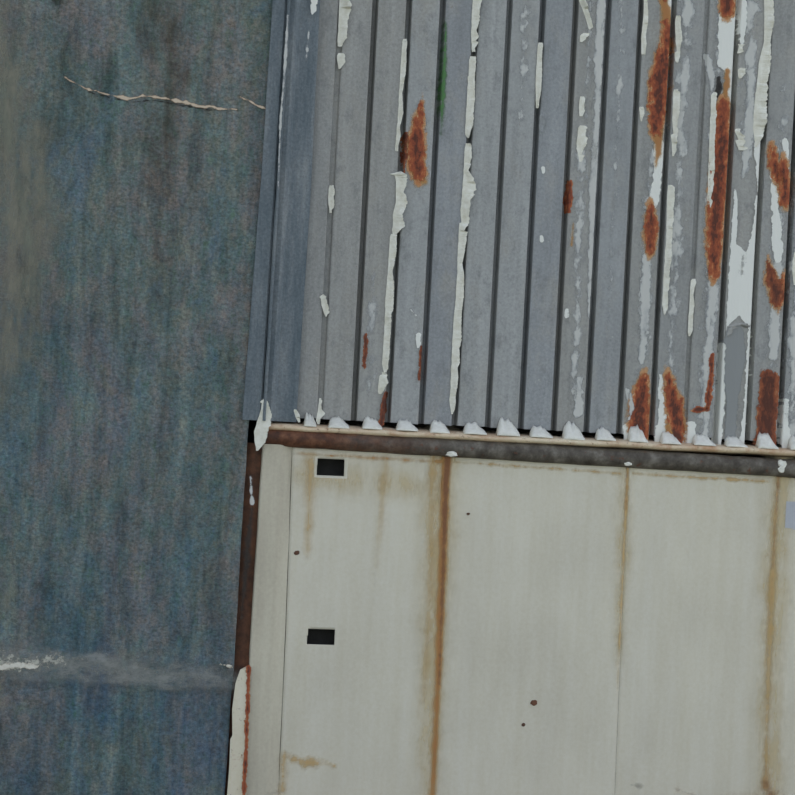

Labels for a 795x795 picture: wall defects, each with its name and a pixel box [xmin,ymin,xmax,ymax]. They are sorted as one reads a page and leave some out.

crack [65,77,266,111]
peeling [366,171,408,394]
peeling [395,39,407,151]
corrosion [400,100,428,187]
peeling [449,0,482,414]
corrosion [646,0,674,166]
peeling [638,0,775,445]
corrosion [703,69,731,286]
corrosion [753,369,780,445]
peeling [767,171,795,448]
corrosion [242,665,251,795]
corrosion [424,456,451,795]